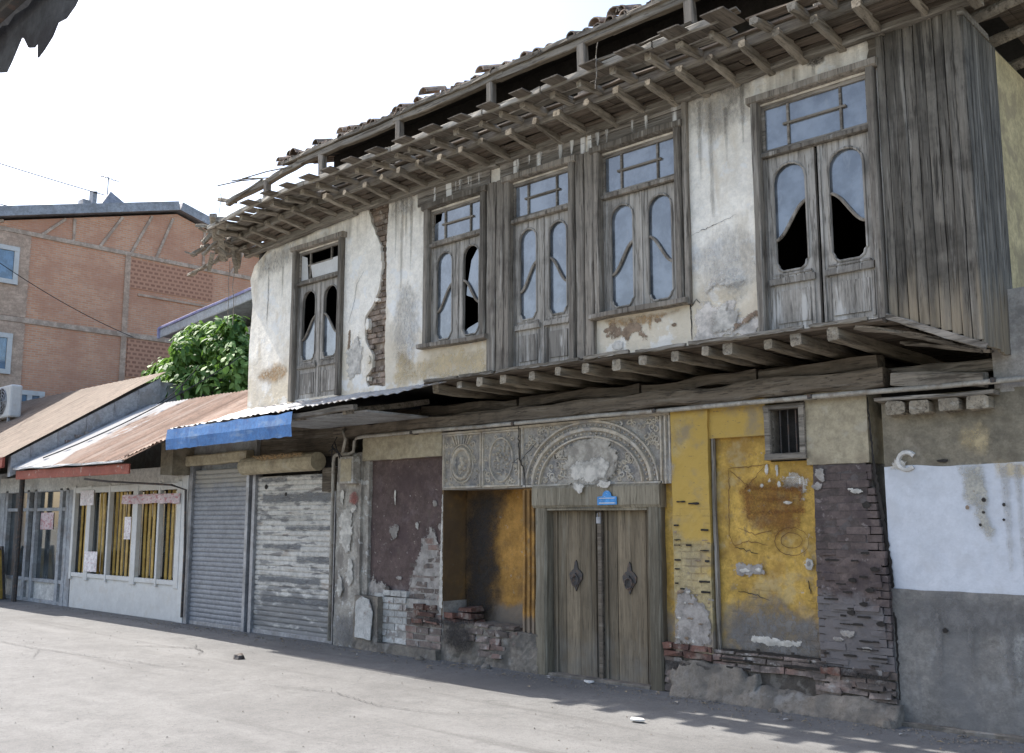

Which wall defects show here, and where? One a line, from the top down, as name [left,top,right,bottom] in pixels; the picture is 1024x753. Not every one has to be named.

spalling [344,204,389,386]
peeling [604,319,648,351]
flaking render [560,434,620,494]
peeling [258,478,357,597]
peeling [354,492,521,659]
peeling [662,587,714,670]
peeling [751,635,802,647]